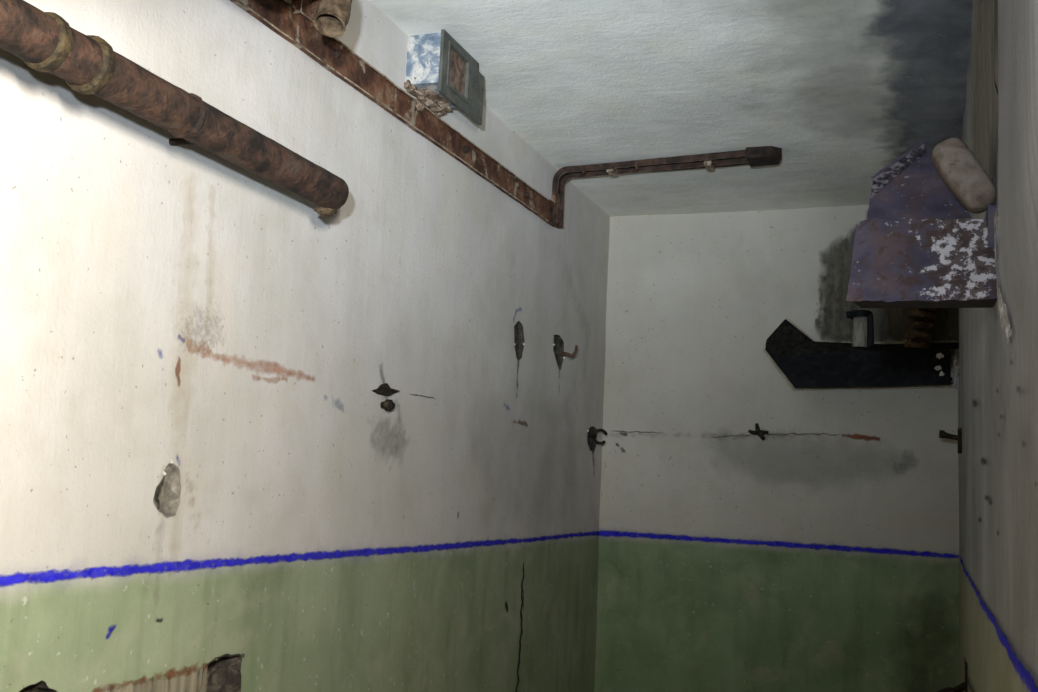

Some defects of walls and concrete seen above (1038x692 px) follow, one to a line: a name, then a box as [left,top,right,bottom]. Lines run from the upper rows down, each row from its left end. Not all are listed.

rust [175,340,229,386]
rust [248,364,314,380]
spalling [153,459,181,518]
crack [515,563,524,692]
flaking render [93,653,245,692]